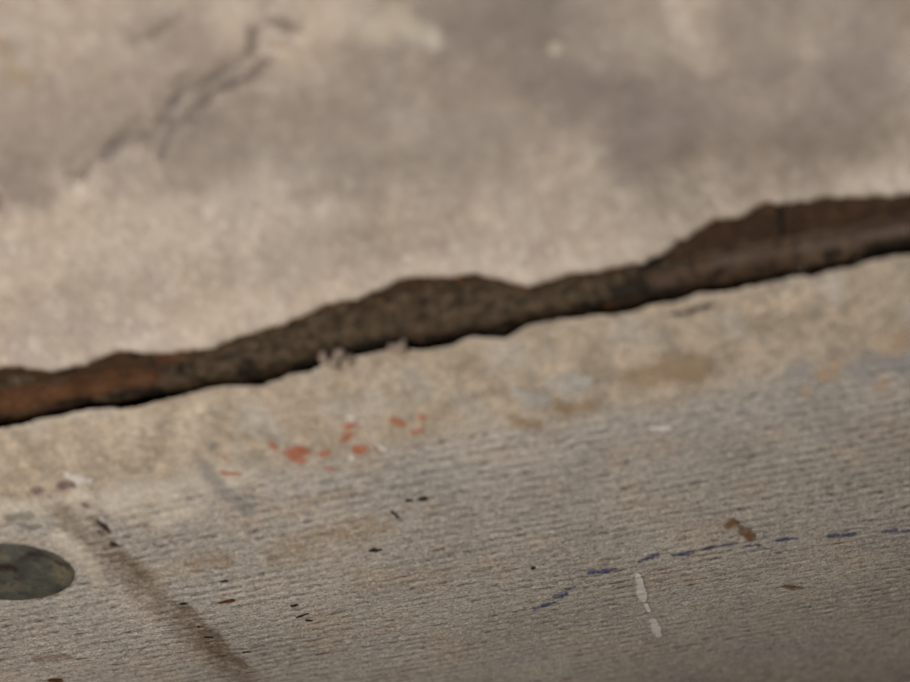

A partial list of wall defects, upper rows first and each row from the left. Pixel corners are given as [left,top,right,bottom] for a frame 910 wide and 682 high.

rust [0,353,191,421]